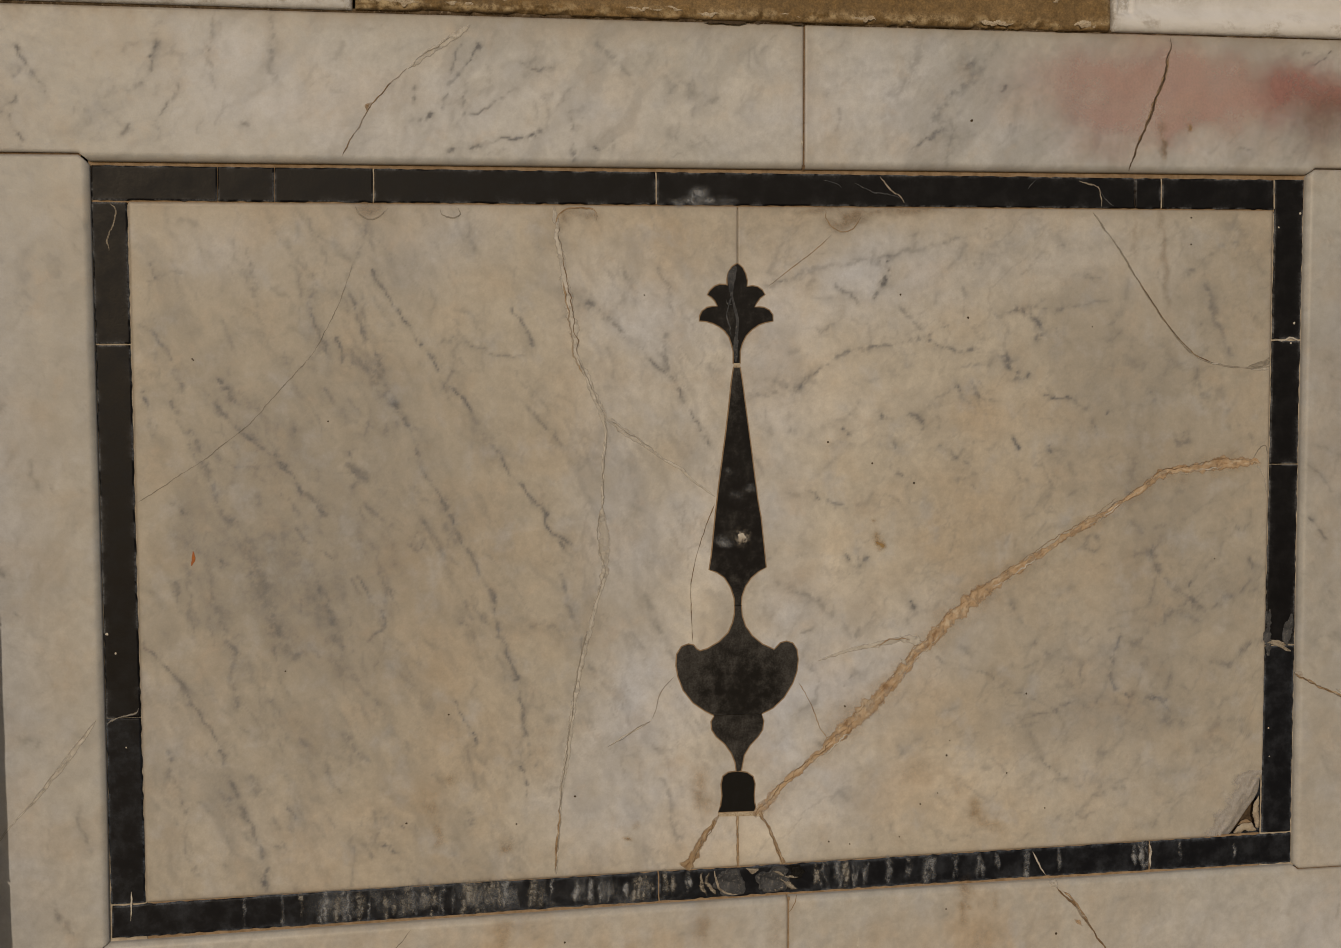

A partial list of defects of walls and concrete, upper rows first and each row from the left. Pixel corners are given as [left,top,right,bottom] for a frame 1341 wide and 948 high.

crack [1129,39,1172,169]
crack [1080,181,1300,371]
crack [552,209,714,873]
crack [680,445,1264,871]
crack [1295,671,1341,697]
spalling [1209,756,1270,836]
crack [1033,853,1106,948]